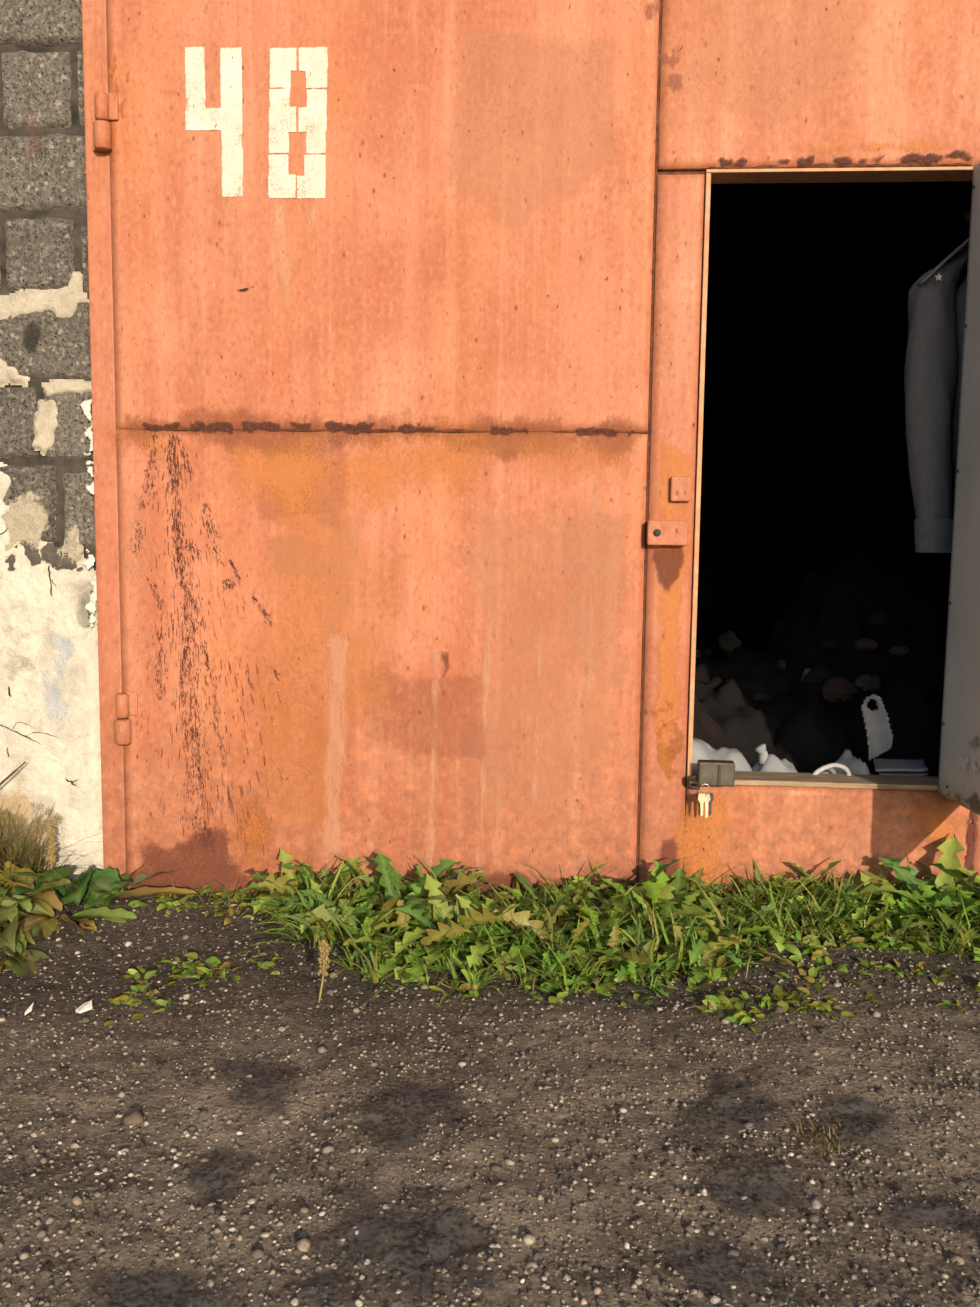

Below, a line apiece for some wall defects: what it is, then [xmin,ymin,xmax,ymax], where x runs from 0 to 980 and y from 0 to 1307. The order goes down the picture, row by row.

corrosion [720,157,747,166]
corrosion [780,155,815,166]
corrosion [834,155,884,164]
corrosion [902,149,973,163]
peeling [81,399,94,494]
peeling [2,486,97,627]
corrosion [126,410,635,854]